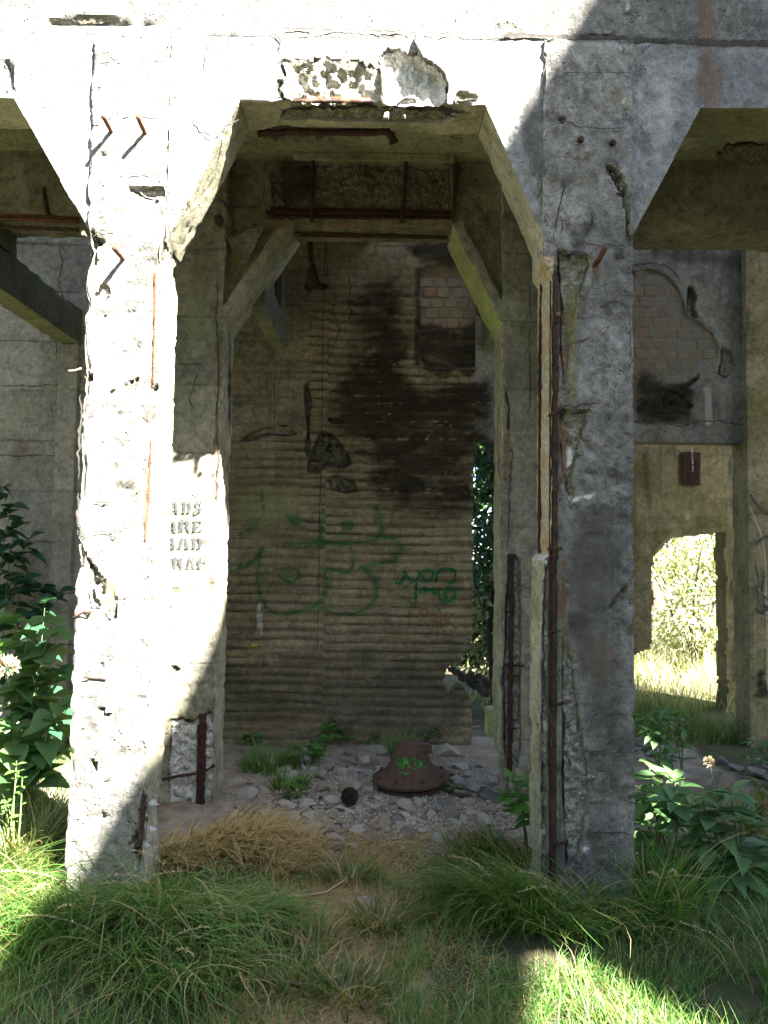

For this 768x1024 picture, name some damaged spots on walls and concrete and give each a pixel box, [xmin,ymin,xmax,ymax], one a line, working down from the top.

spalling [278,31,469,121]
spalling [606,163,633,240]
damp [375,291,491,416]
flaking render [418,266,476,368]
flaking render [632,270,735,409]
spalling [305,415,355,492]
spalling [136,713,215,848]